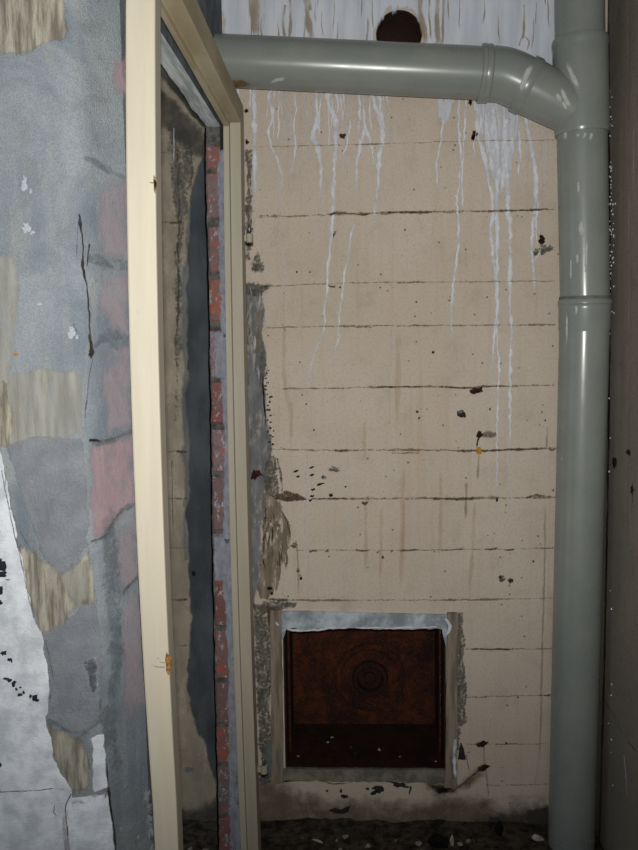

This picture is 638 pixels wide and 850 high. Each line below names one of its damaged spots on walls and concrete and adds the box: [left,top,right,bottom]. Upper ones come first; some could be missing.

peeling [115,59,126,92]
crack [73,214,94,410]
peeling [101,186,128,256]
efflorescence [237,77,395,384]
efflorescence [435,98,548,492]
peeling [91,438,133,535]
spalling [246,283,340,784]
peeling [0,453,115,850]
peeling [125,633,145,702]